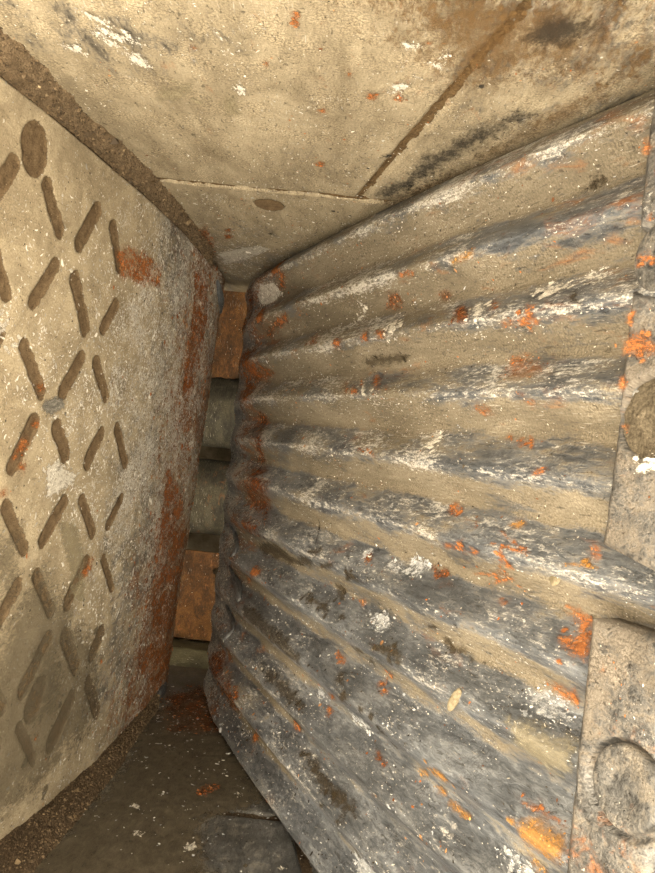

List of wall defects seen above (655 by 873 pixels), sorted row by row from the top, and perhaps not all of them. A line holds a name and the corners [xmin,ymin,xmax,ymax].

rust [615,311,654,363]
rust [111,226,244,734]
rust [228,411,278,537]
rust [556,606,593,665]
rust [506,794,570,873]